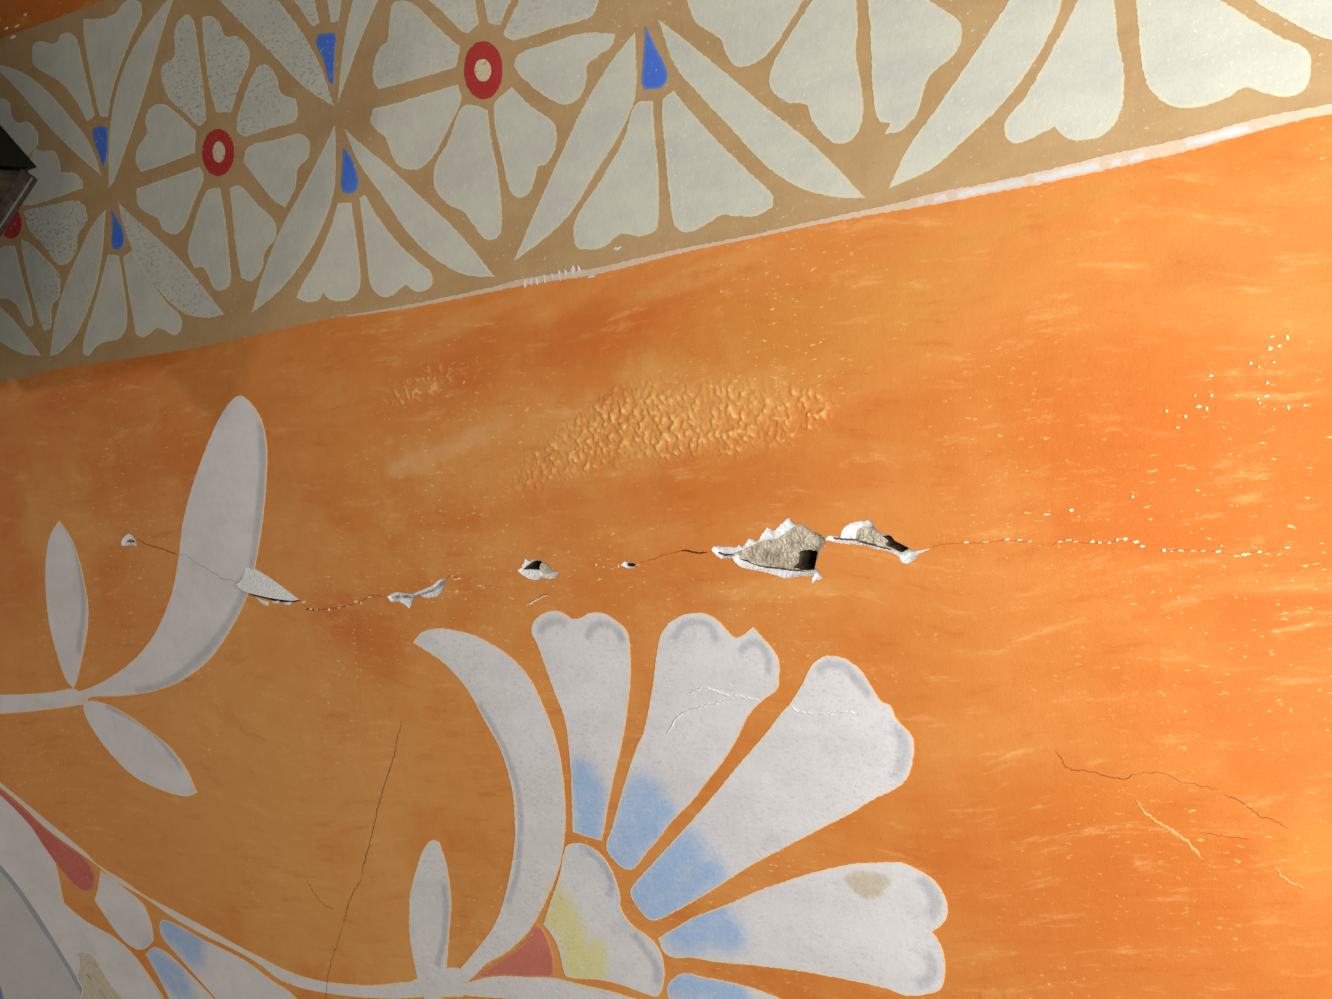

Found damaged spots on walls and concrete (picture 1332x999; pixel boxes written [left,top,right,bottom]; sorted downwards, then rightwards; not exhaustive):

spalling [121,534,137,546]
crack [137,538,238,582]
flaking render [235,567,304,606]
crack [304,595,385,611]
spalling [387,579,446,608]
spalling [518,559,559,580]
crack [573,550,710,571]
spalling [711,518,929,583]
crack [933,509,1290,556]
crack [1057,753,1285,859]
crack [311,721,402,999]
crack [1275,868,1305,889]